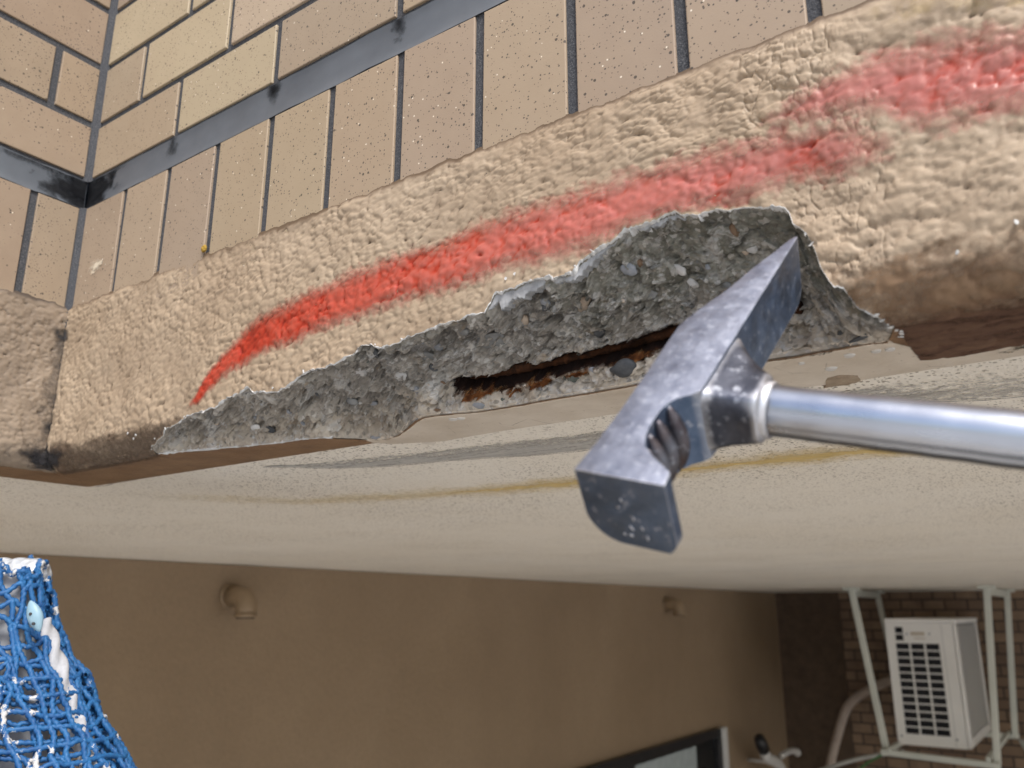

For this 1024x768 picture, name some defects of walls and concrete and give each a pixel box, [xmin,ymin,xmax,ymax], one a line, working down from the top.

rust [453,324,679,402]
spalling [151,204,1024,455]
damp [20,449,62,471]